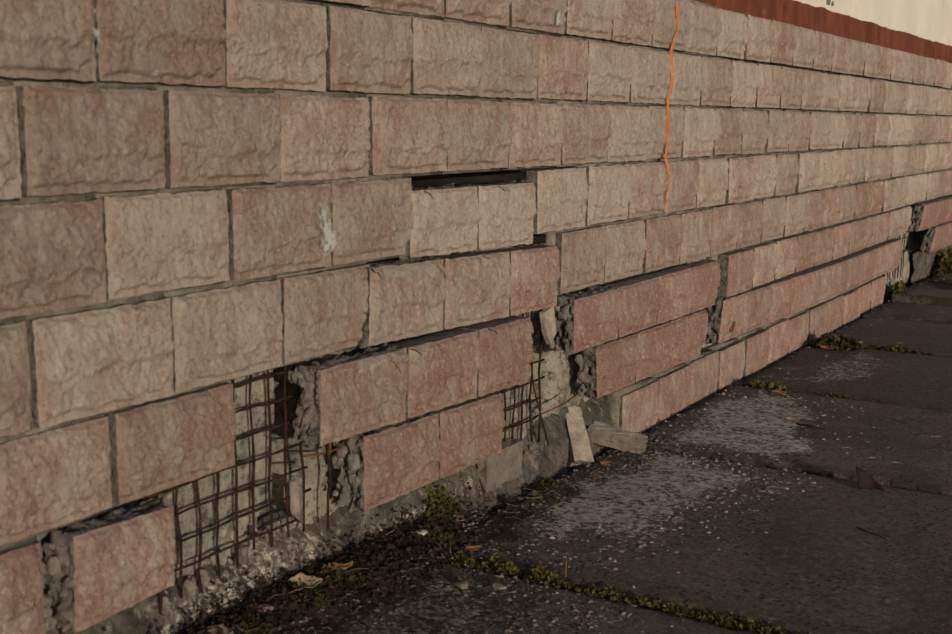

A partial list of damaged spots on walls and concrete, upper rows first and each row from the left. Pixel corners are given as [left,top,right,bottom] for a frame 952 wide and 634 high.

corrosion [664,4,679,214]
spalling [40,532,62,609]
spalling [142,362,360,615]
spalling [496,306,591,467]